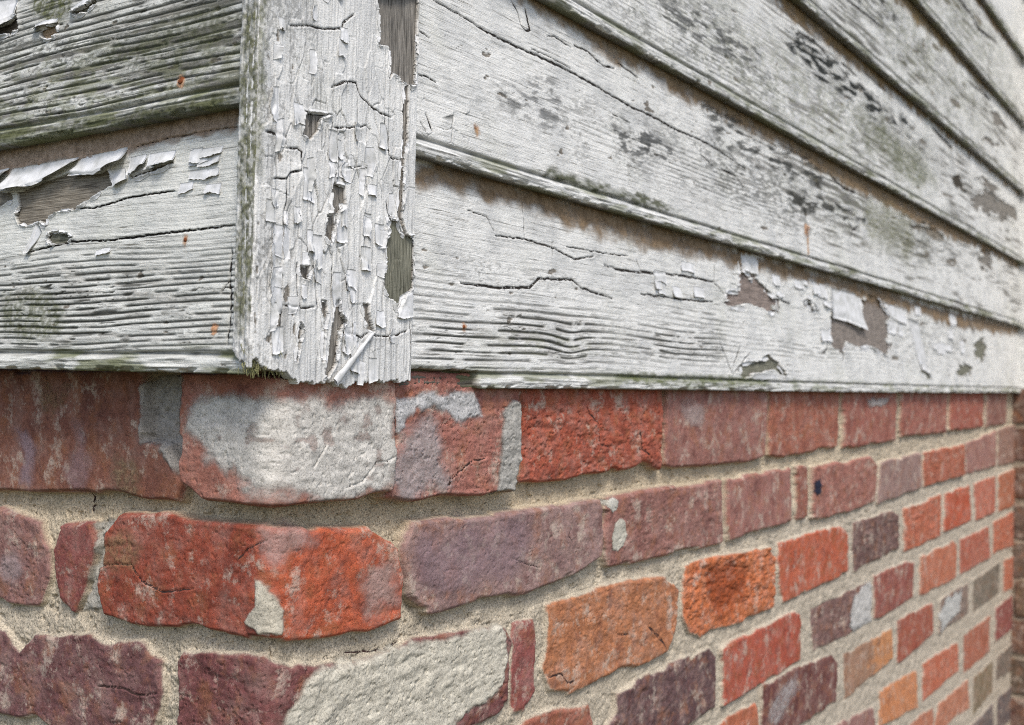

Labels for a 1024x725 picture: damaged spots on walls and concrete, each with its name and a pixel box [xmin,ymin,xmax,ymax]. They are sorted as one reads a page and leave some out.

crack [433,0,746,185]
peeling [0,147,177,254]
crack [80,191,172,209]
peeling [178,146,224,195]
peeling [265,0,420,385]
crack [28,225,233,253]
crack [460,211,719,303]
peeling [976,250,992,272]
peeling [723,253,922,357]
peeling [738,355,785,380]
peeling [937,314,986,376]
crack [103,563,191,593]